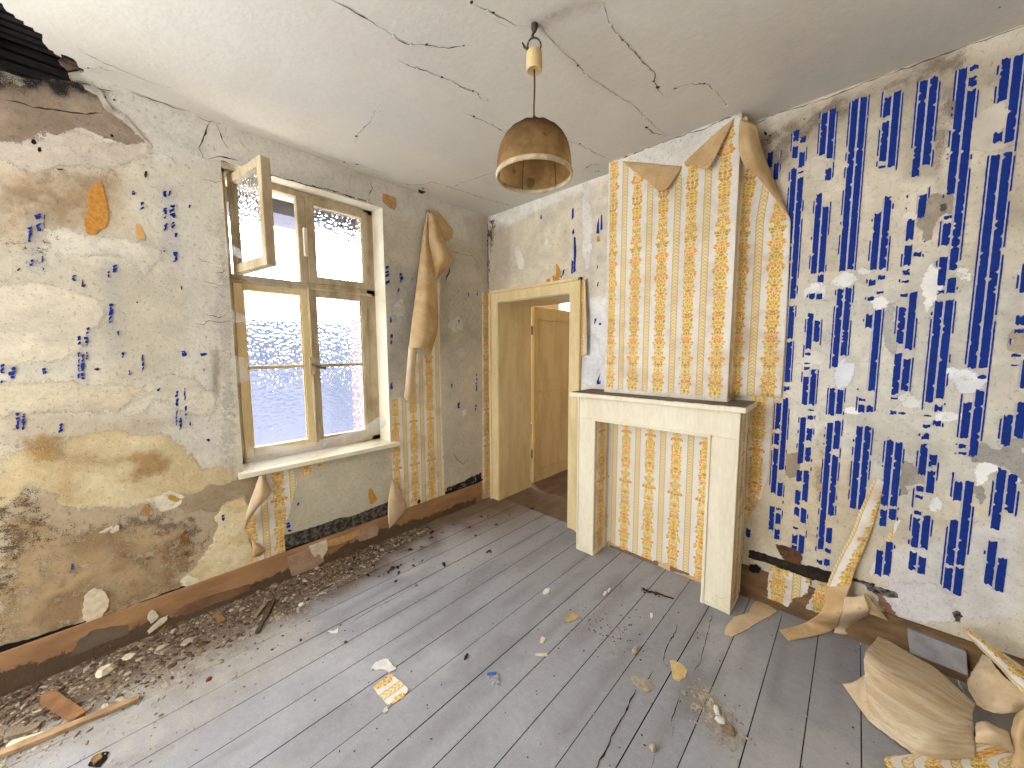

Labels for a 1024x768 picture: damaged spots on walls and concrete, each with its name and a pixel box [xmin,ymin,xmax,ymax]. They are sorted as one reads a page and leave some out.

crack [470,0,514,27]
flaking render [0,3,153,178]
crack [2,47,250,183]
crack [334,1,506,134]
flaking render [916,193,954,242]
flaking render [883,302,899,355]
flaking render [899,461,927,495]
flaking render [970,436,1024,484]
leakage [0,428,209,646]
flaking render [147,468,259,587]
flaking render [776,544,803,566]
peeling [147,584,250,634]